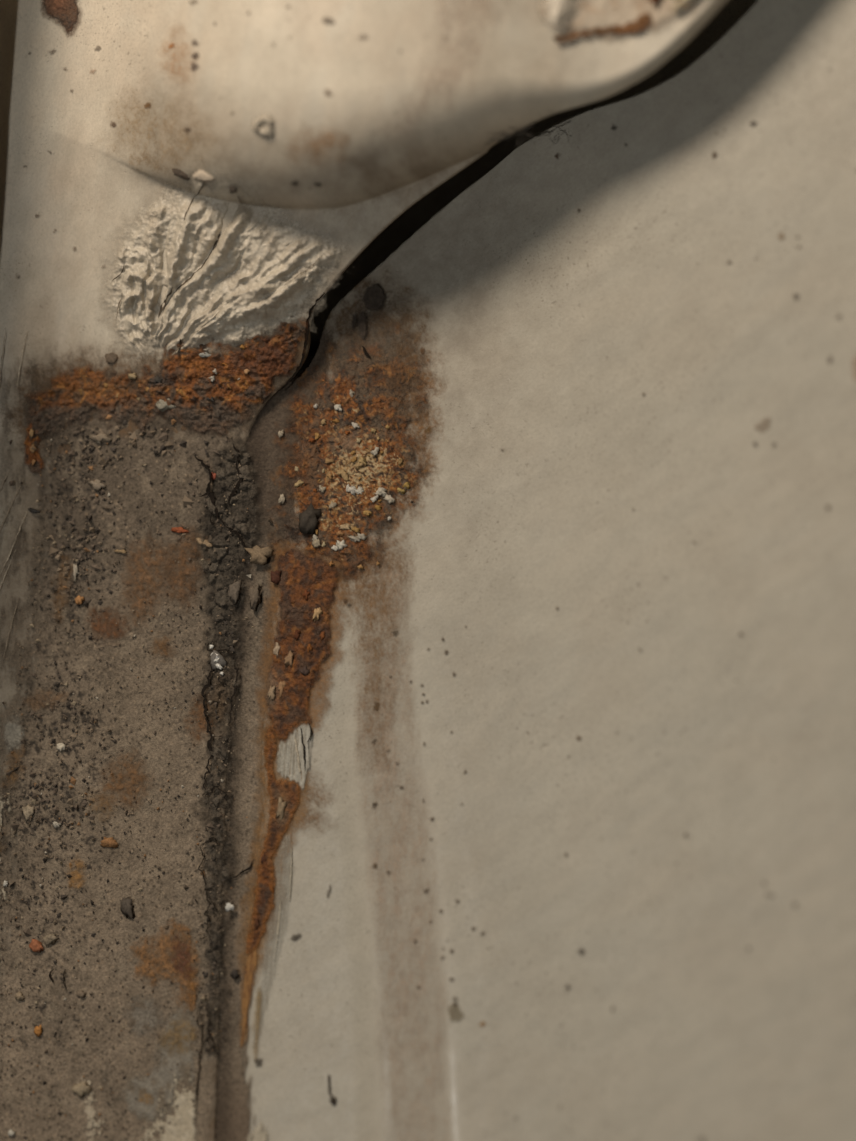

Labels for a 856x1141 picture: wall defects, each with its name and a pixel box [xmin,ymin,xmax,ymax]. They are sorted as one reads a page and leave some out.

corrosion [539,0,696,43]
crack [195,444,246,553]
corrosion [7,277,437,1050]
crack [201,643,239,808]
crack [198,837,254,948]